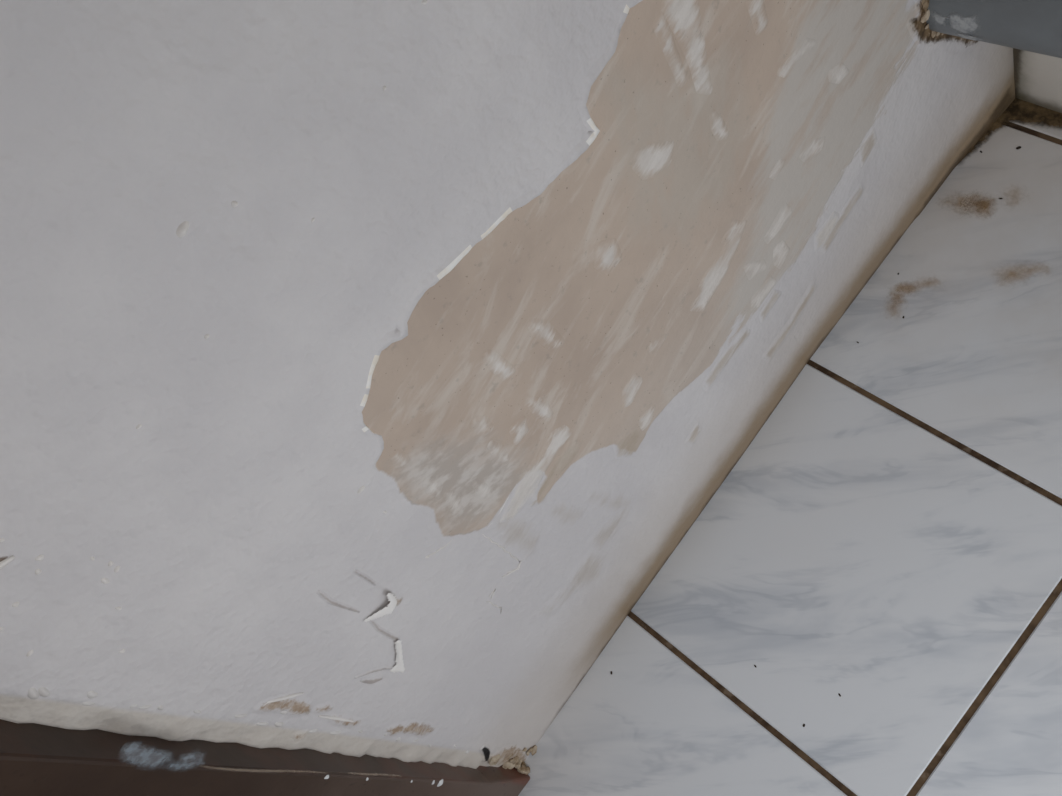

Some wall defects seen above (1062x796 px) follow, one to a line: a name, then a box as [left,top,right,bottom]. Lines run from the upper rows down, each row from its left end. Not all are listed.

peeling [308,0,981,574]